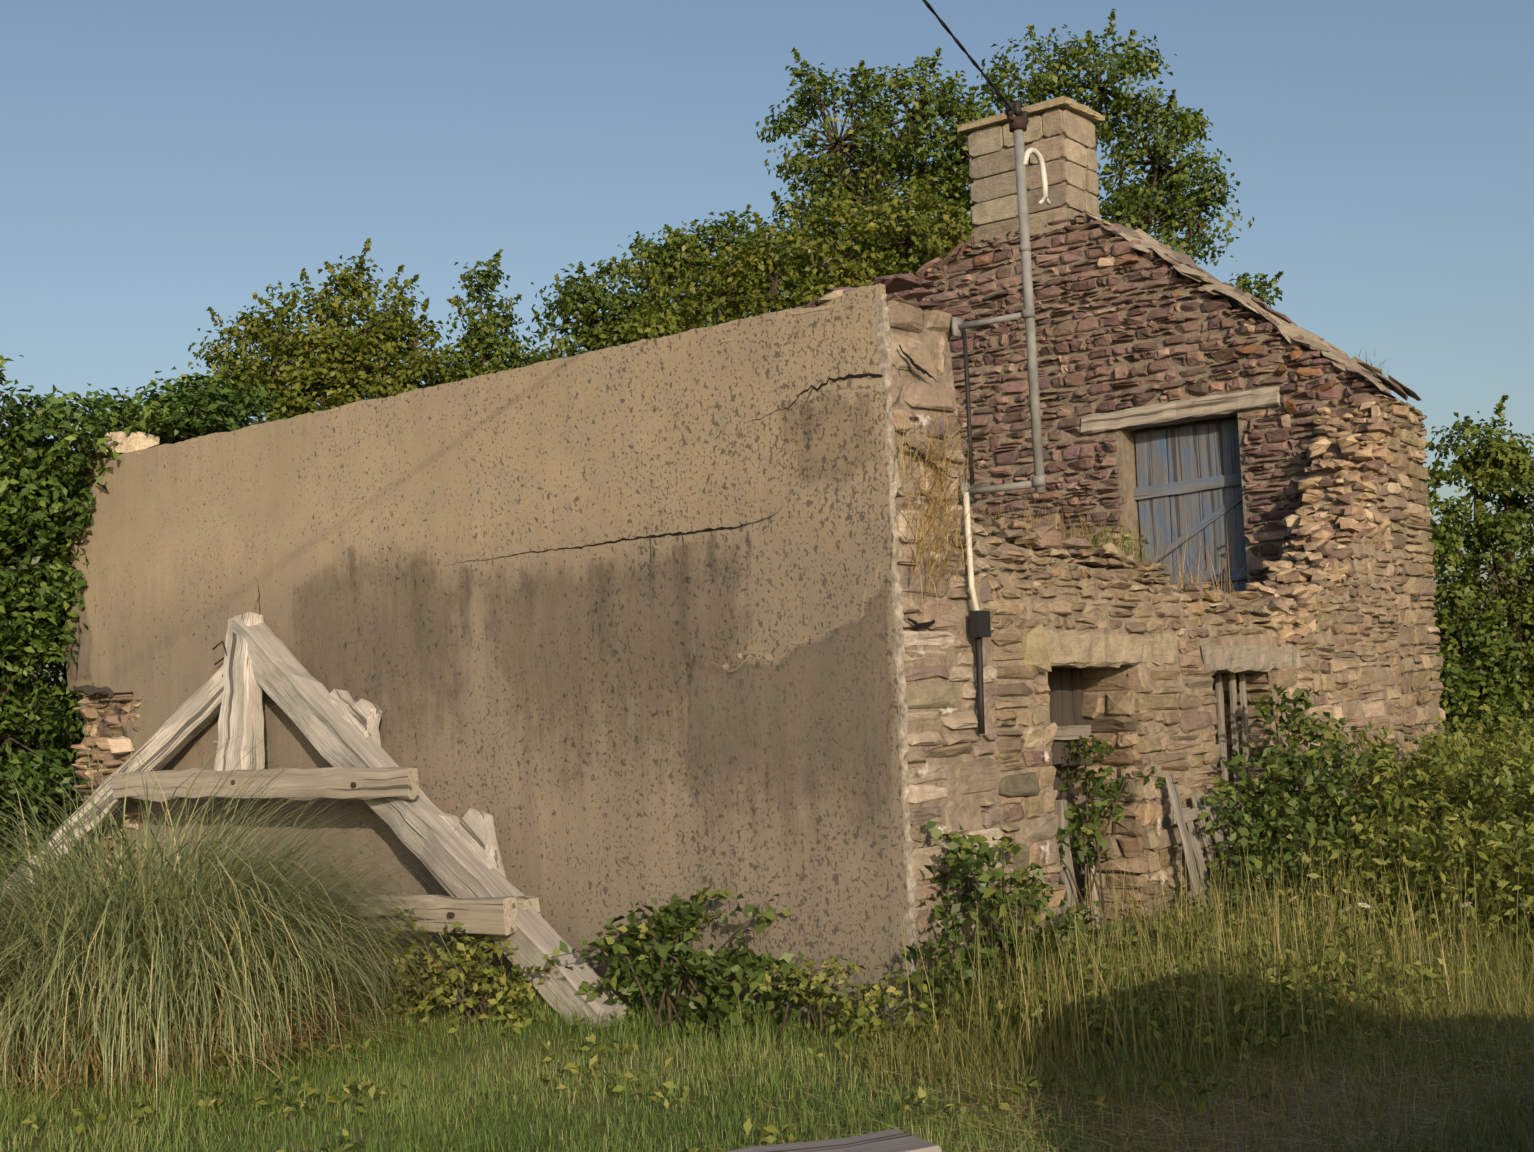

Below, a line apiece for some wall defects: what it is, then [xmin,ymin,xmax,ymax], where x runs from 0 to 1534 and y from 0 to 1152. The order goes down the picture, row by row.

crack [751,345,937,421]
crack [445,508,781,588]
leakage [294,553,470,716]
leakage [491,548,736,743]